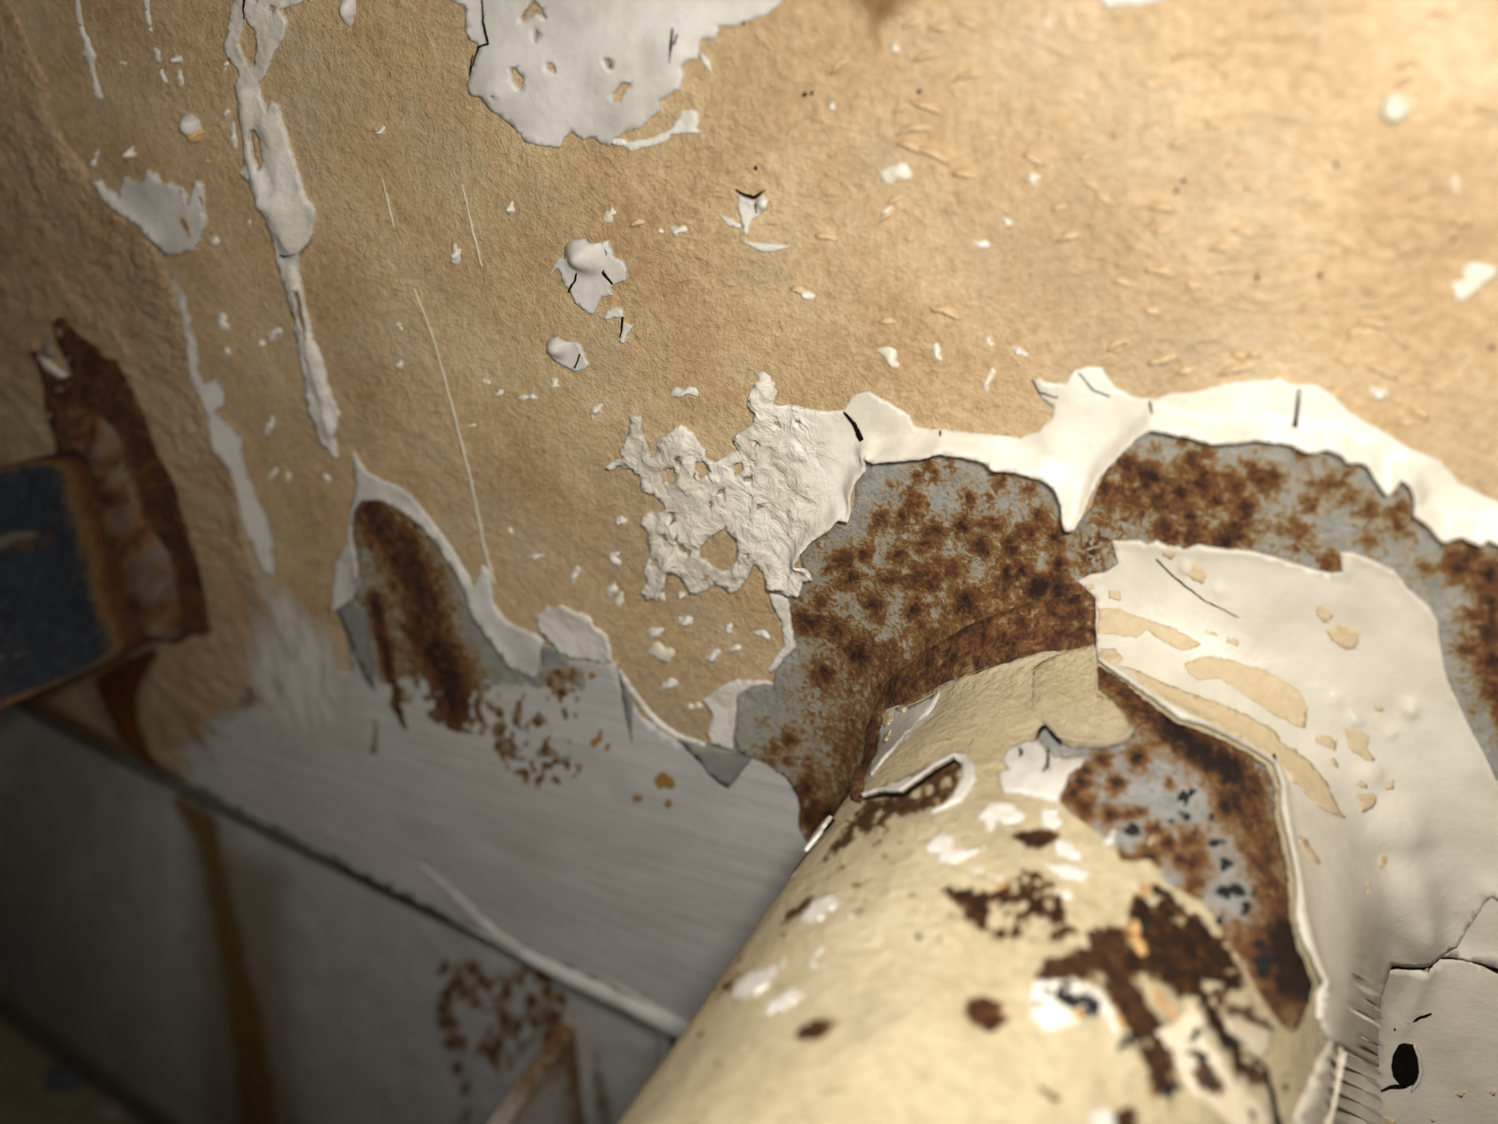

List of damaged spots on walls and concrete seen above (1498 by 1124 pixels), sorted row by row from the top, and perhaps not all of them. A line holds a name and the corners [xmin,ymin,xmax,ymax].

peeling [451,0,782,152]
peeling [720,189,790,252]
rust [30,317,212,769]
peeling [605,366,1498,751]
peeling [804,816,833,852]
rust [331,431,1498,915]
peeling [860,691,976,814]
peeling [926,539,1498,1124]
rust [434,953,568,1124]
rust [793,1017,838,1041]
rust [908,868,1291,1103]
rust [1114,1105,1141,1124]